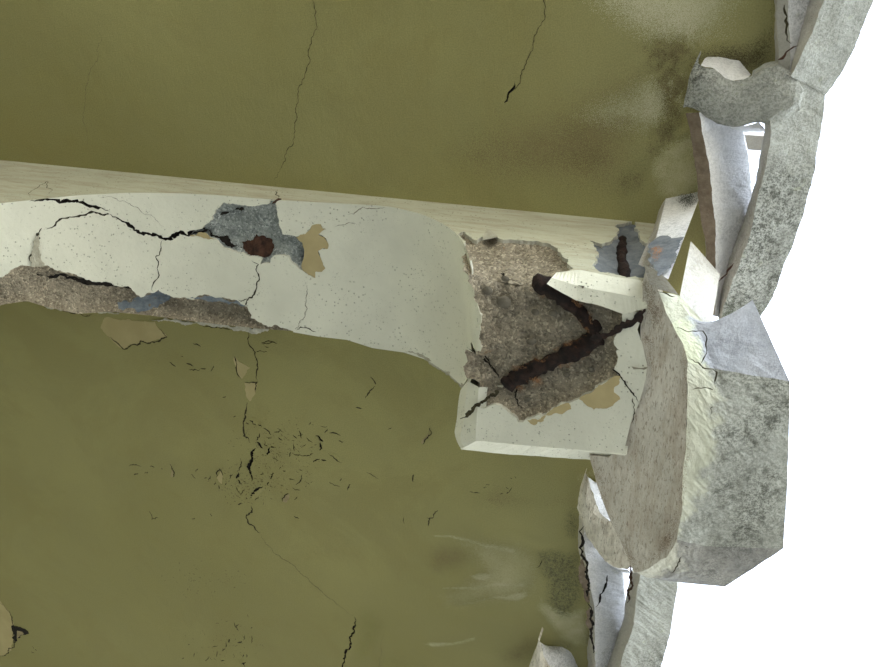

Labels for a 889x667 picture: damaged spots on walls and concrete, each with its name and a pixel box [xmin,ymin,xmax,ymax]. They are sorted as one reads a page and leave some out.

crack [504,0,546,103]
crack [272,2,317,204]
crack [28,181,207,290]
spalling [190,201,329,278]
spalling [594,225,684,278]
spalling [0,265,291,350]
spalling [408,230,623,425]
crack [243,402,256,480]
crack [246,507,293,565]
peeling [0,601,29,656]
crack [314,585,356,667]
crack [579,526,634,653]